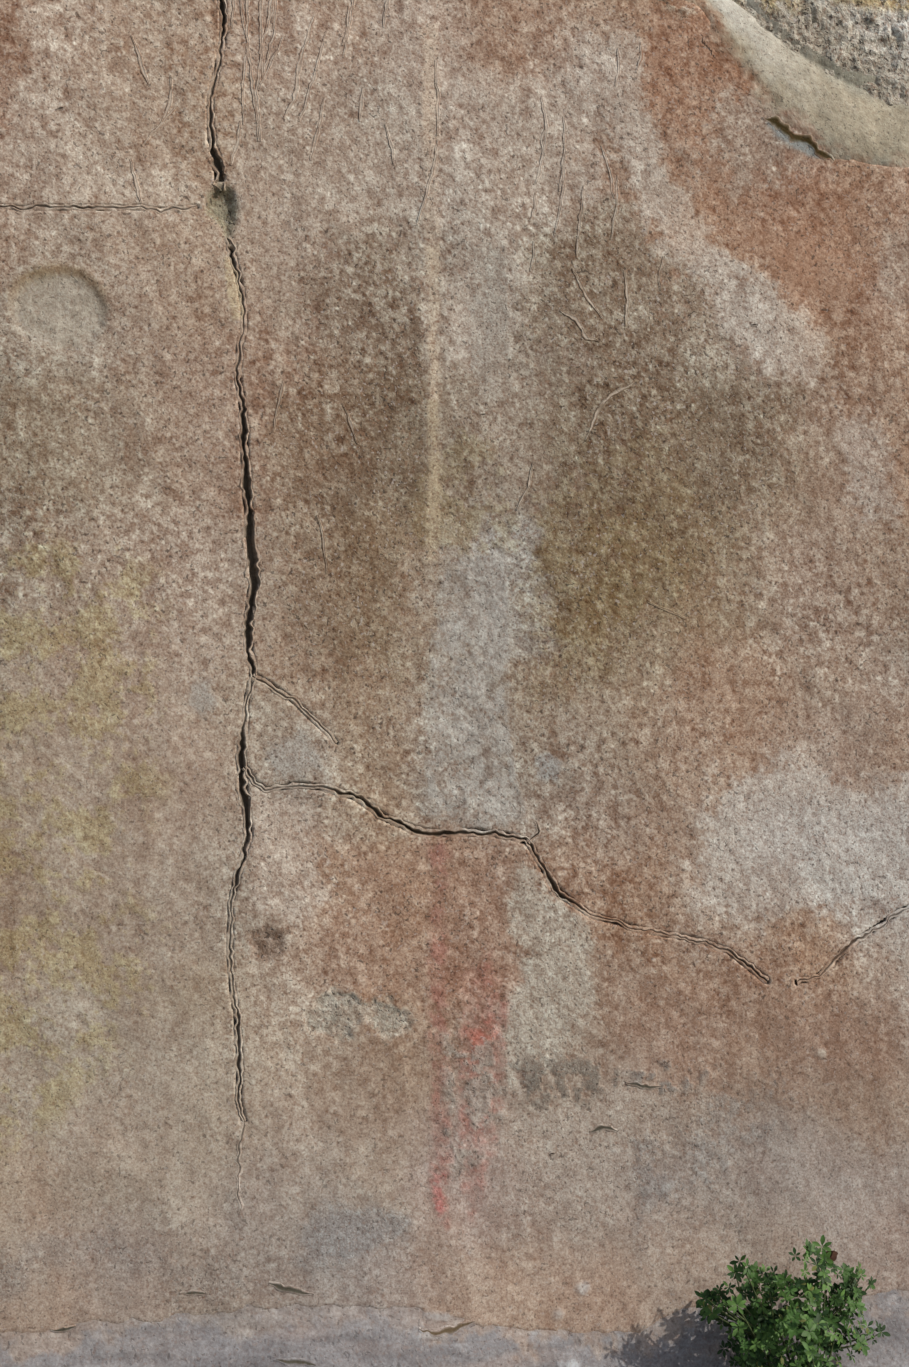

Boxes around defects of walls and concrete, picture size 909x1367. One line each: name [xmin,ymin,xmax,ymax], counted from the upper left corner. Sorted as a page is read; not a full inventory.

crack [0,0,230,214]
crack [224,237,909,1214]